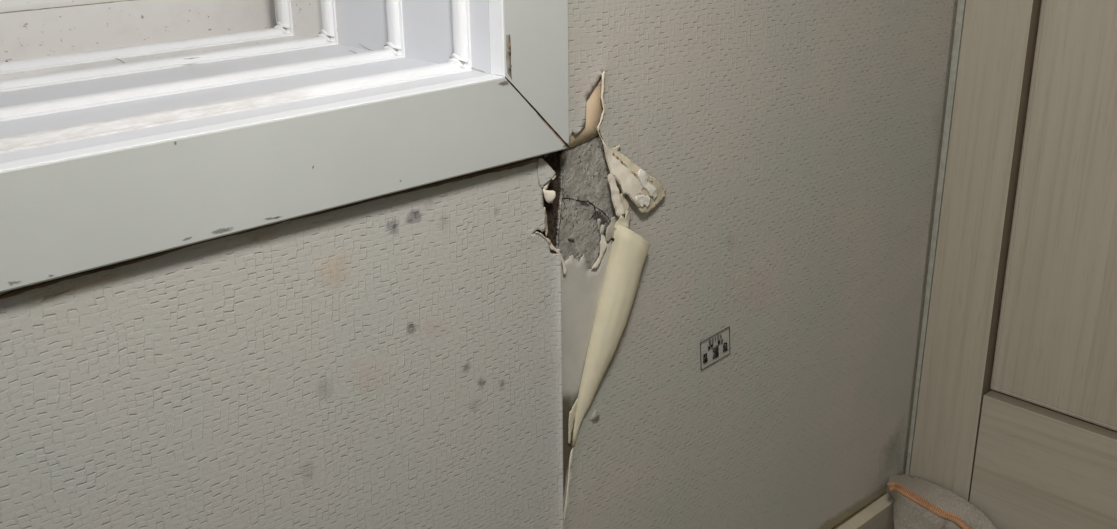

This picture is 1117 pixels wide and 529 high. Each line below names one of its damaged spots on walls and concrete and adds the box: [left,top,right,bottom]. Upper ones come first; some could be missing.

spalling [556,134,623,269]
peeling [636,169,658,208]